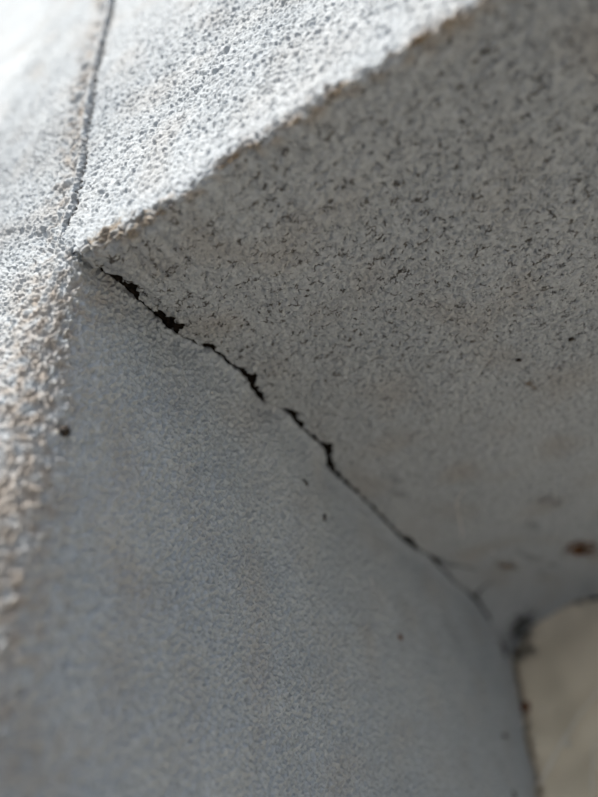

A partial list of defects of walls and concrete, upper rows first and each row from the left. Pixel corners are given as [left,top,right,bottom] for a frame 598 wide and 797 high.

crack [100,268,509,647]